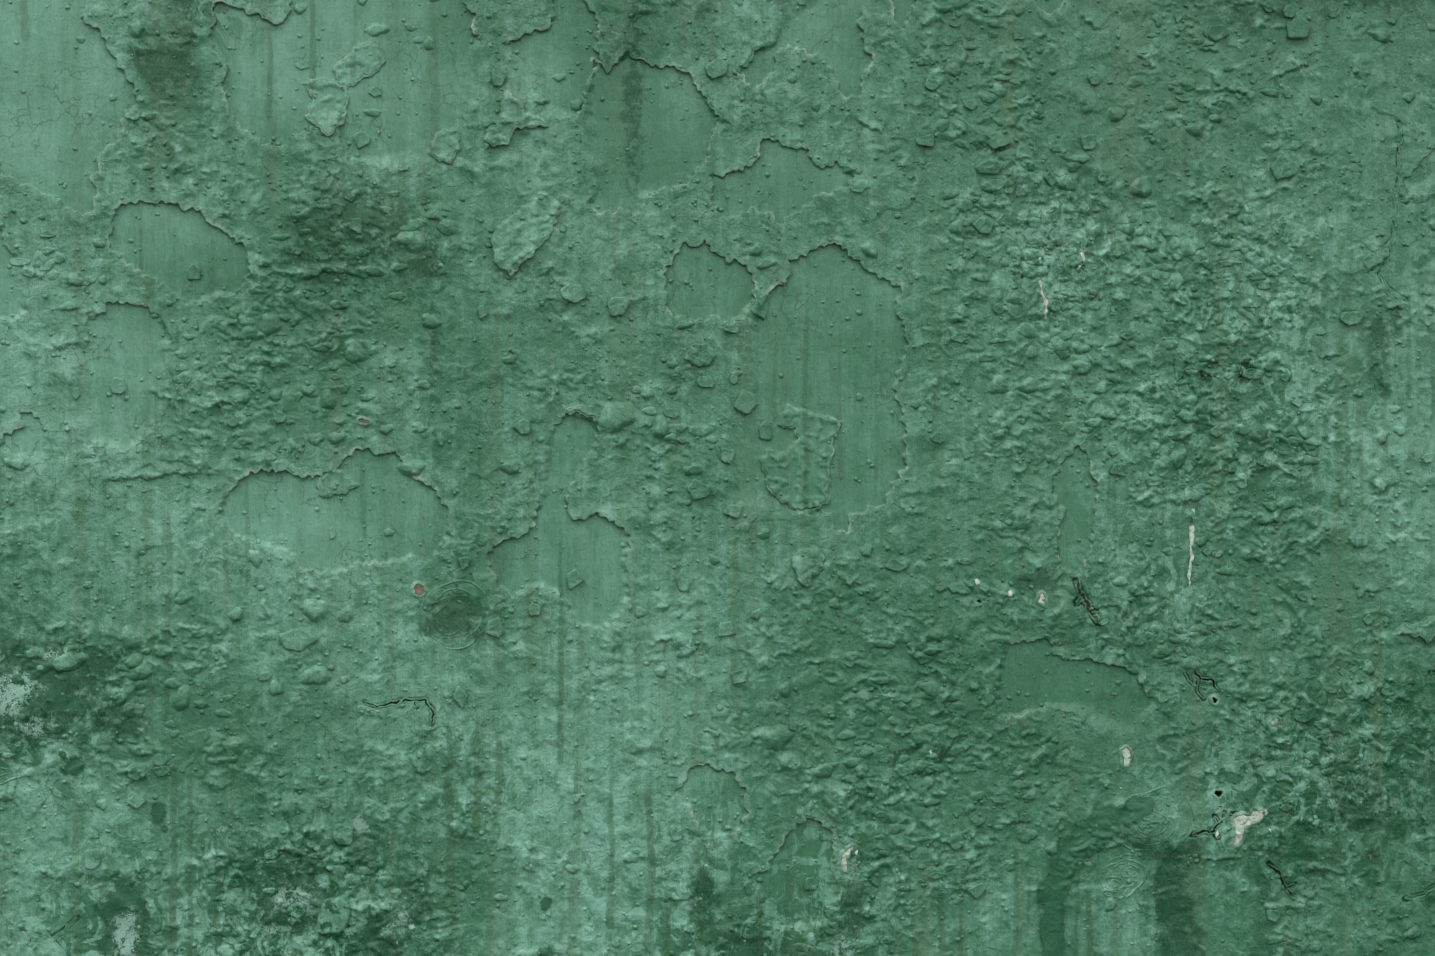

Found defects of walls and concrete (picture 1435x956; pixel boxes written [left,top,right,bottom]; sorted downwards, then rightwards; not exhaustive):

peeling [0,0,259,474]
peeling [479,410,639,636]
peeling [200,0,924,599]
peeling [670,756,757,847]